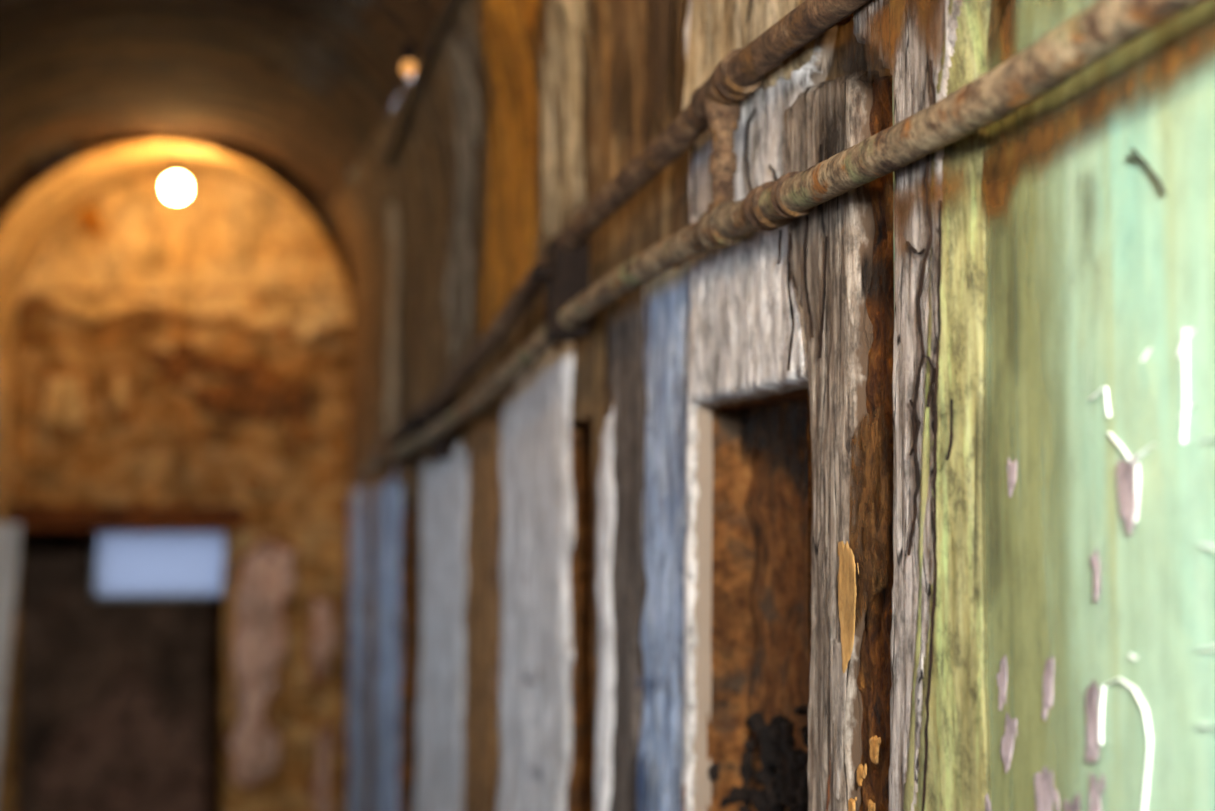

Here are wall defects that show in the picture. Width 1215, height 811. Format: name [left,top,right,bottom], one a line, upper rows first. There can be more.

rust [869,0,941,66]
rust [987,0,1015,63]
spalling [869,76,893,136]
crack [928,60,936,105]
rust [981,19,1215,216]
rust [479,0,540,337]
rust [894,171,963,247]
spalling [829,172,894,811]
crack [906,154,954,811]
peeling [982,163,1106,811]
peeling [1116,454,1138,537]